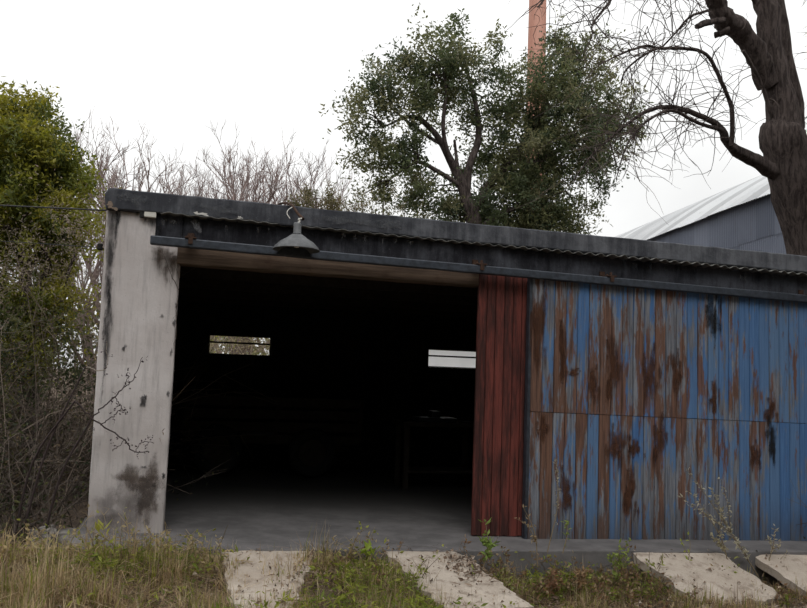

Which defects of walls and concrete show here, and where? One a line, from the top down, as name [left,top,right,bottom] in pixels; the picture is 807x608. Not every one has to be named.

leakage [103,210,120,373]
leakage [117,462,158,520]
rust [530,281,546,370]
rust [560,466,575,510]
rust [559,320,621,401]
rust [606,412,668,517]
rust [642,343,682,400]
rust [705,295,722,334]
rust [709,381,720,413]
rust [751,397,778,469]